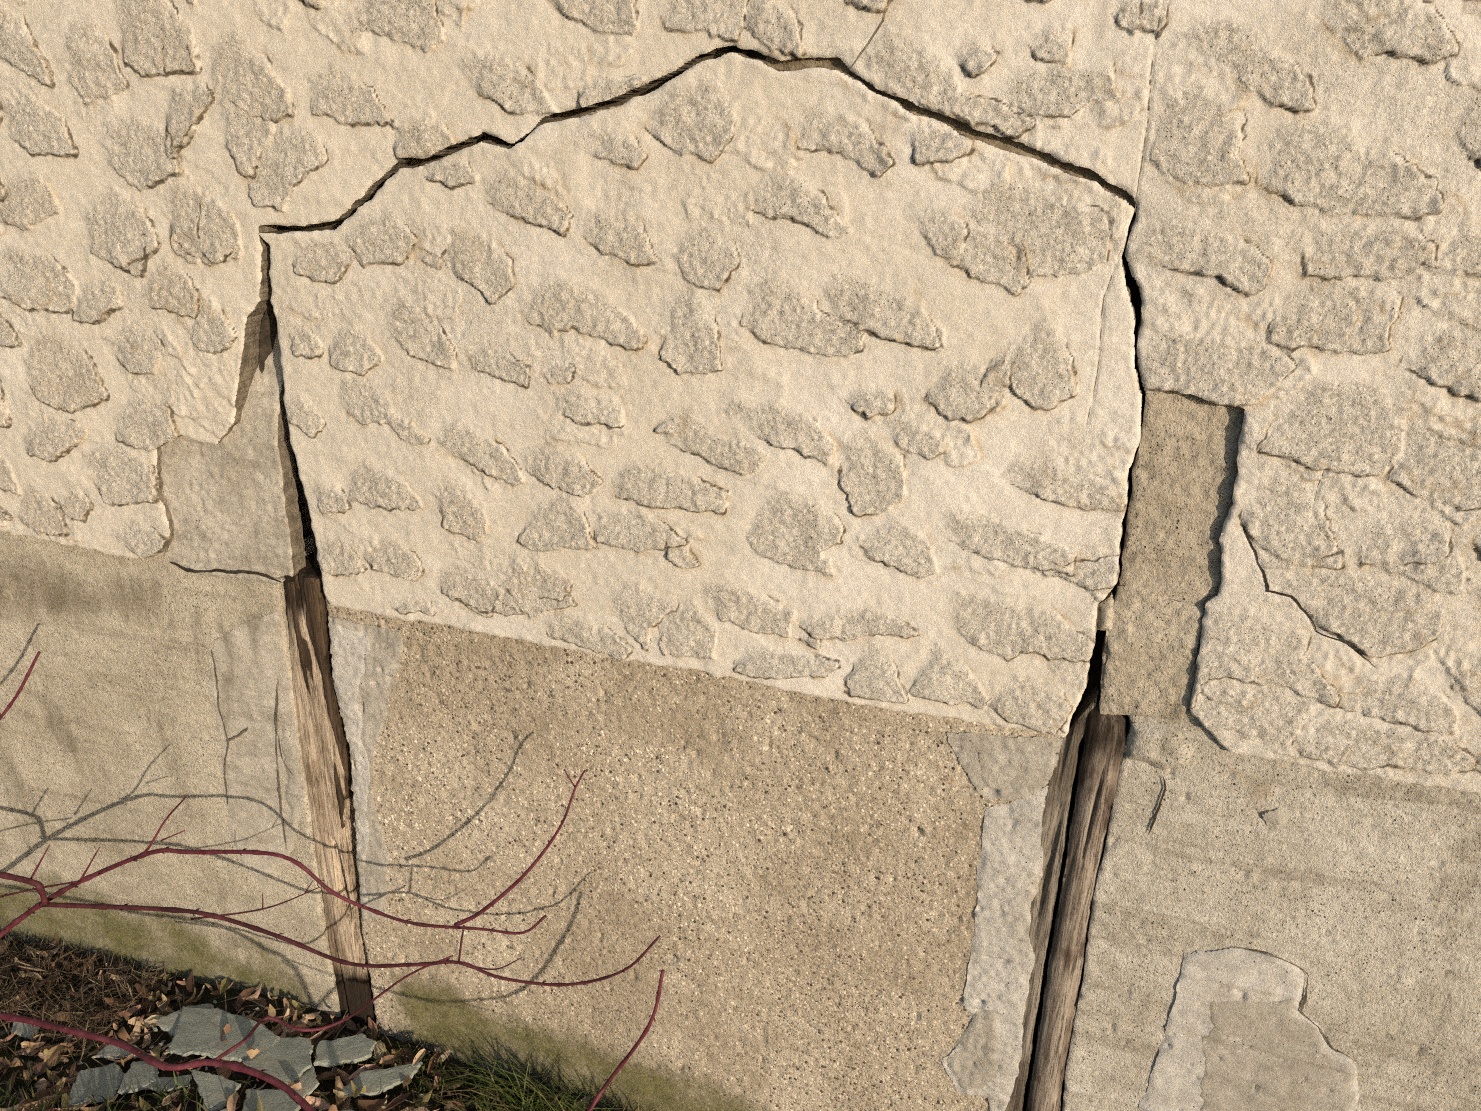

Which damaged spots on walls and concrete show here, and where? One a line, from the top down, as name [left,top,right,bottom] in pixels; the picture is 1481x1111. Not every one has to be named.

crack [259,301,278,373]
crack [278,220,345,231]
crack [406,136,517,168]
crack [552,0,1164,422]
crack [170,562,282,583]
spalling [160,334,306,585]
crack [300,480,320,568]
crack [1082,465,1132,698]
spalling [1098,390,1244,770]
crack [1240,518,1375,667]
peeling [328,616,404,919]
peeling [941,731,1063,1111]